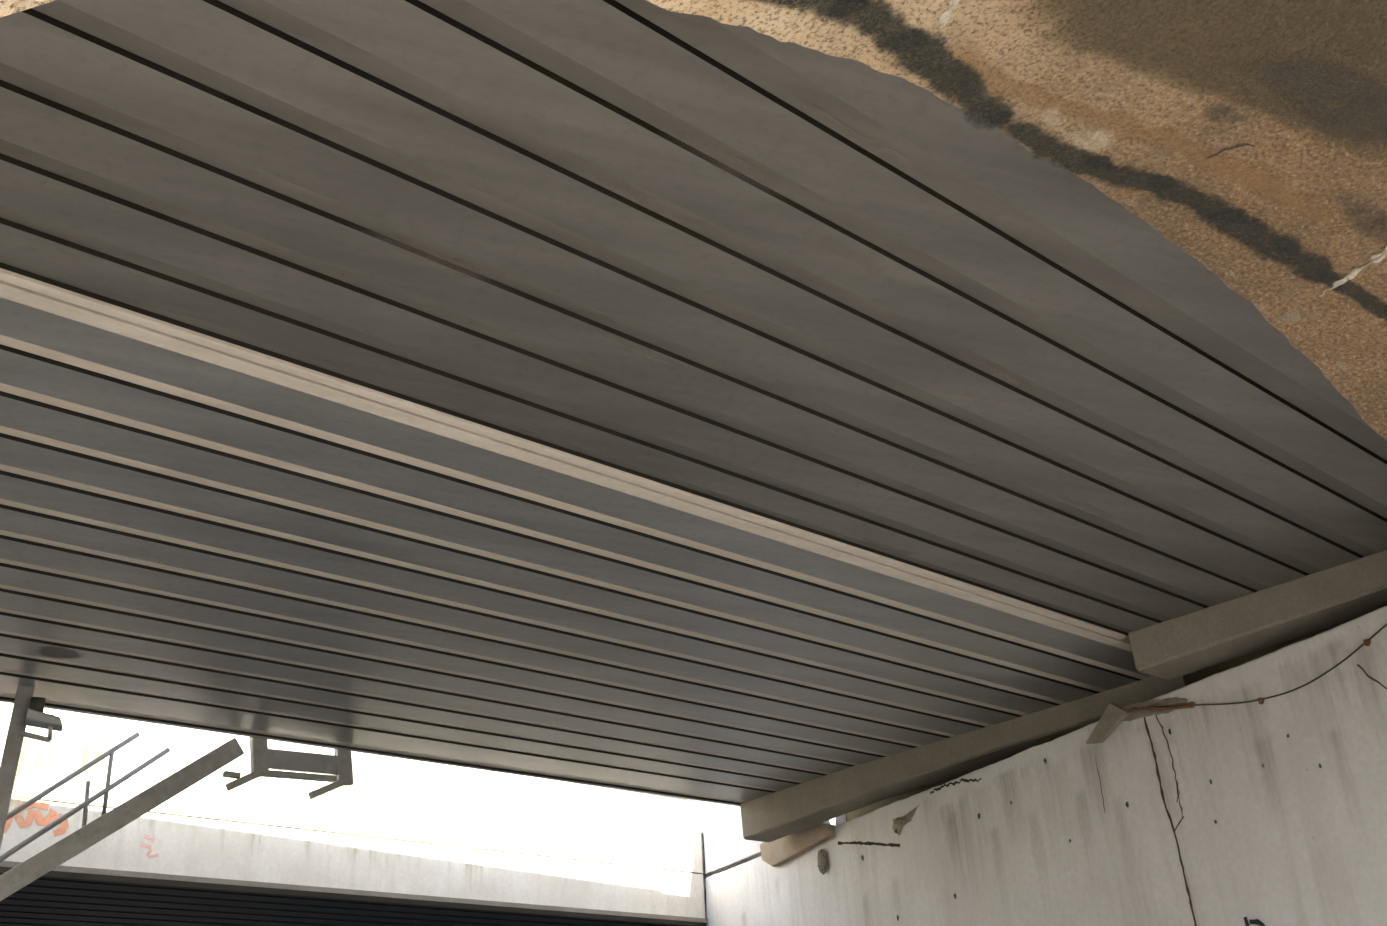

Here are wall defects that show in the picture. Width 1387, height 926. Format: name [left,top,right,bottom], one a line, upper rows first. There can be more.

damp [1041,0,1387,142]
crack [1319,252,1387,297]
damp [1334,217,1387,286]
damp [254,756,671,823]
crack [1144,715,1197,926]